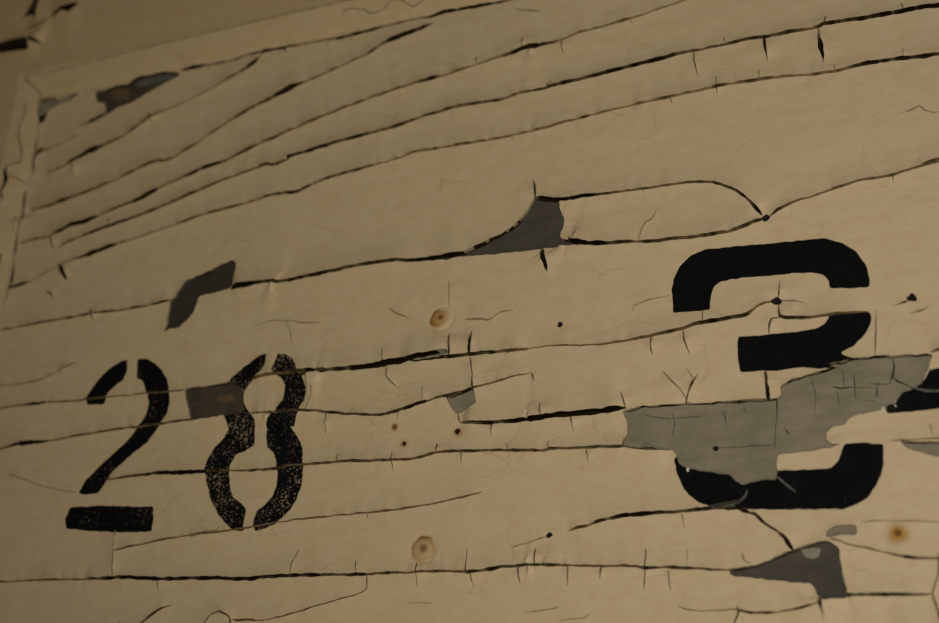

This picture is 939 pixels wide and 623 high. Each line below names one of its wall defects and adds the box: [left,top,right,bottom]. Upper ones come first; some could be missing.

peeling [80,71,180,126]
crack [0,0,939,331]
peeling [442,199,579,259]
peeling [164,260,236,332]
crack [0,362,184,410]
crack [0,419,192,450]
peeling [185,381,244,420]
crack [105,280,929,480]
peeling [621,353,932,485]
crack [0,490,939,623]
peeling [730,525,857,598]
rust [890,526,906,540]